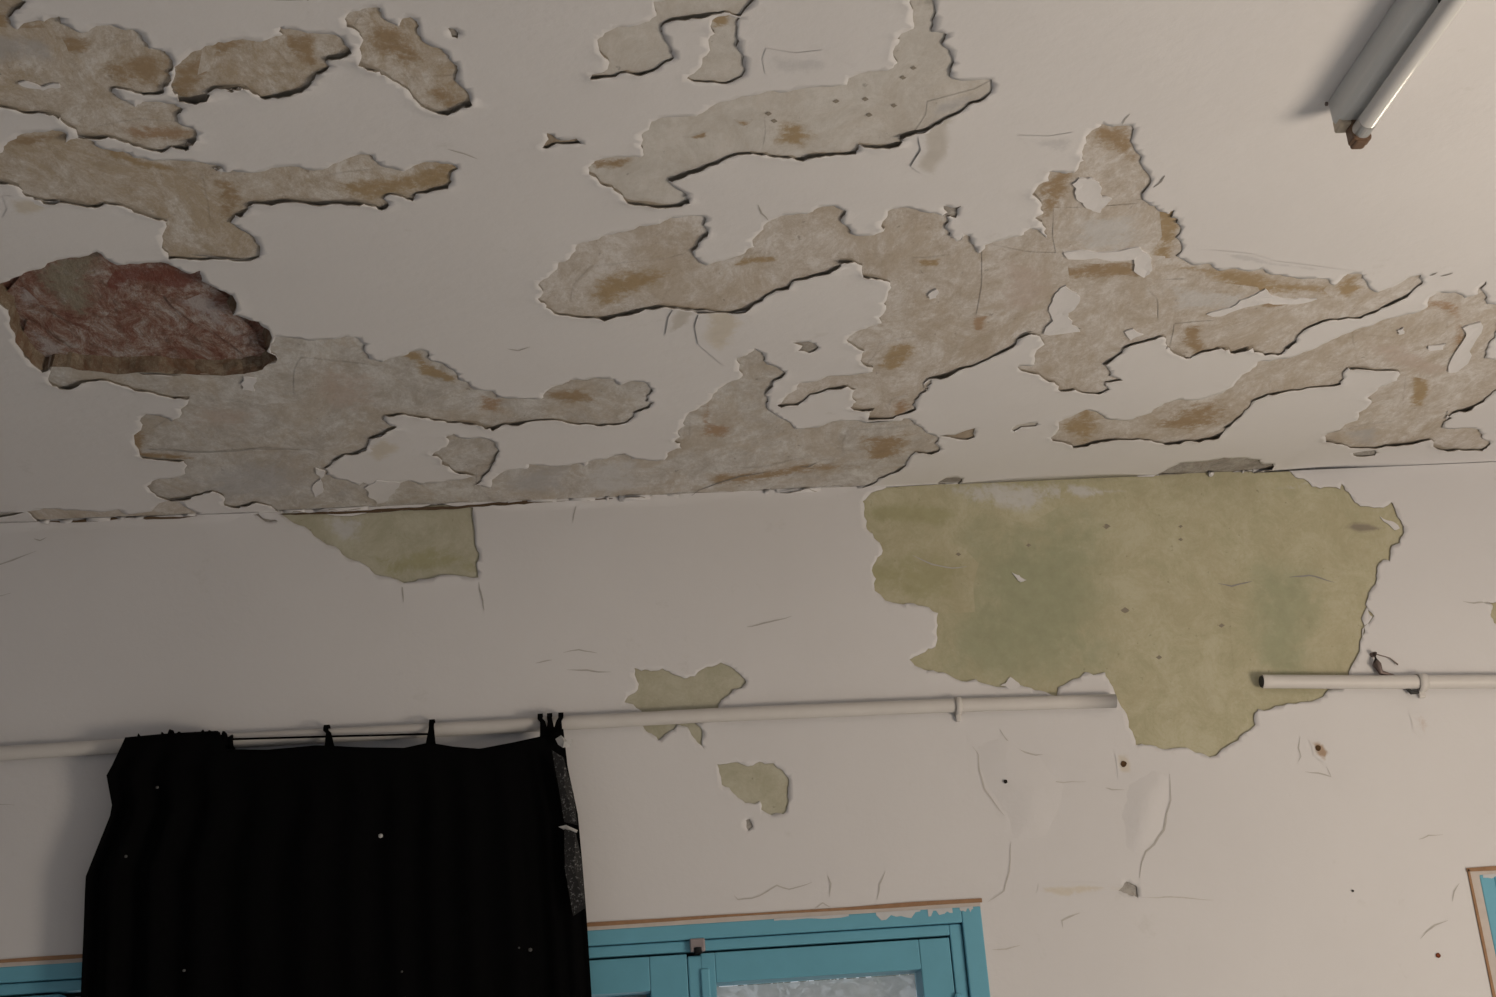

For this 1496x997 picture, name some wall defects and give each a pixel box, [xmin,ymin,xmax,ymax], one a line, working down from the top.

peeling [0,0,1496,757]
peeling [717,762,789,831]